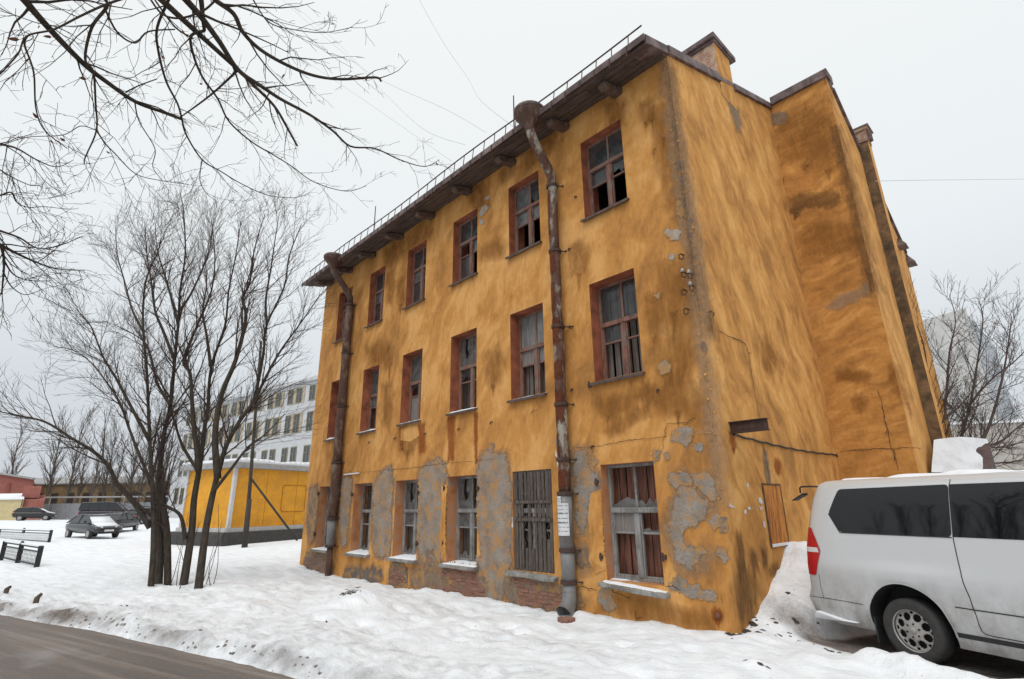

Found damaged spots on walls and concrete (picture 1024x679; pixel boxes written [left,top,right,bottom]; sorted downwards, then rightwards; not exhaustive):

leakage [772,106,878,308]
corrosion [549,251,561,346]
flaking render [650,59,766,603]
crack [840,389,921,471]
flaking render [302,442,617,623]